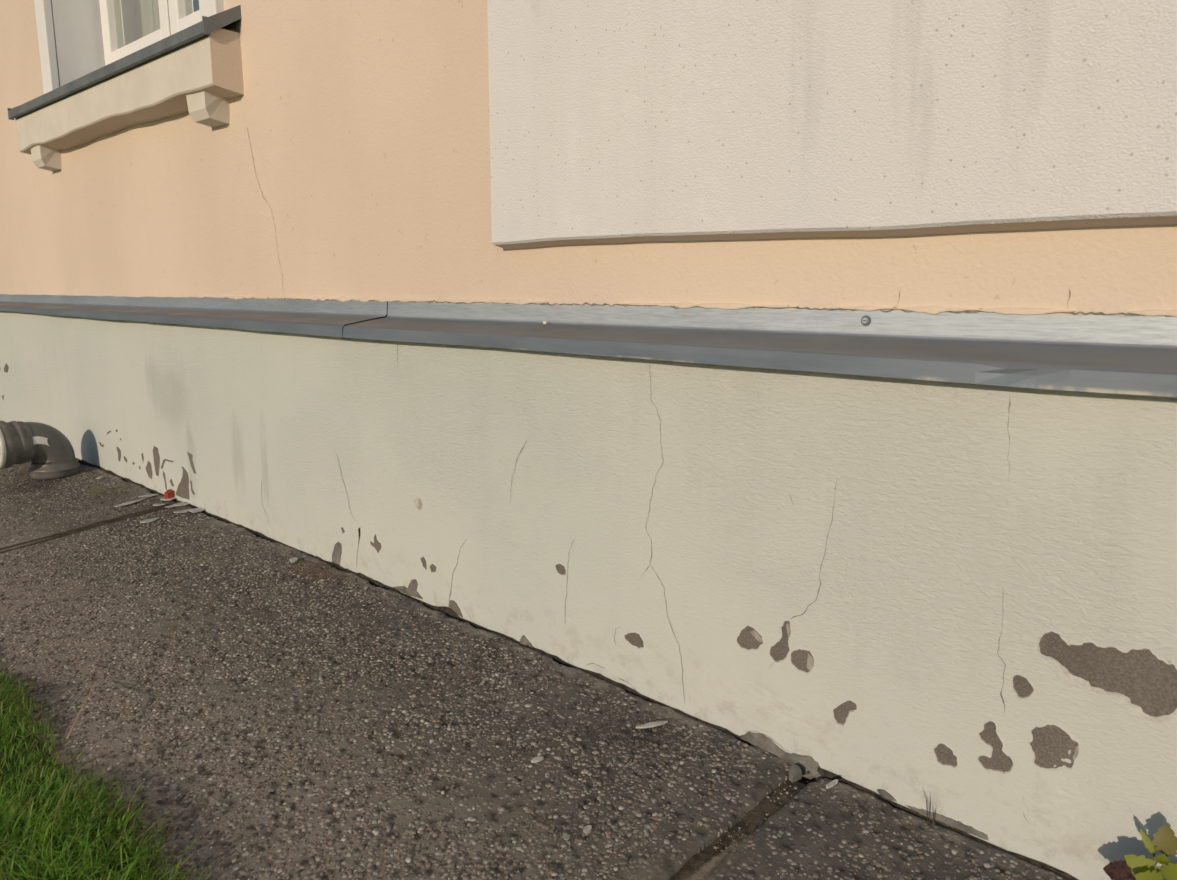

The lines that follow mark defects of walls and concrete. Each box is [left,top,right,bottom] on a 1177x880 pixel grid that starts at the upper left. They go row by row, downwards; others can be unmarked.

peeling [98,429,197,507]
peeling [332,527,382,567]
crack [791,481,837,619]
spalling [392,556,437,600]
peeling [624,632,645,649]
peeling [737,620,815,674]
crack [997,604,1006,711]
peeling [1038,630,1177,723]
peeling [832,699,858,726]
peeling [933,742,959,768]
peeling [977,720,1015,774]
peeling [1029,723,1080,771]